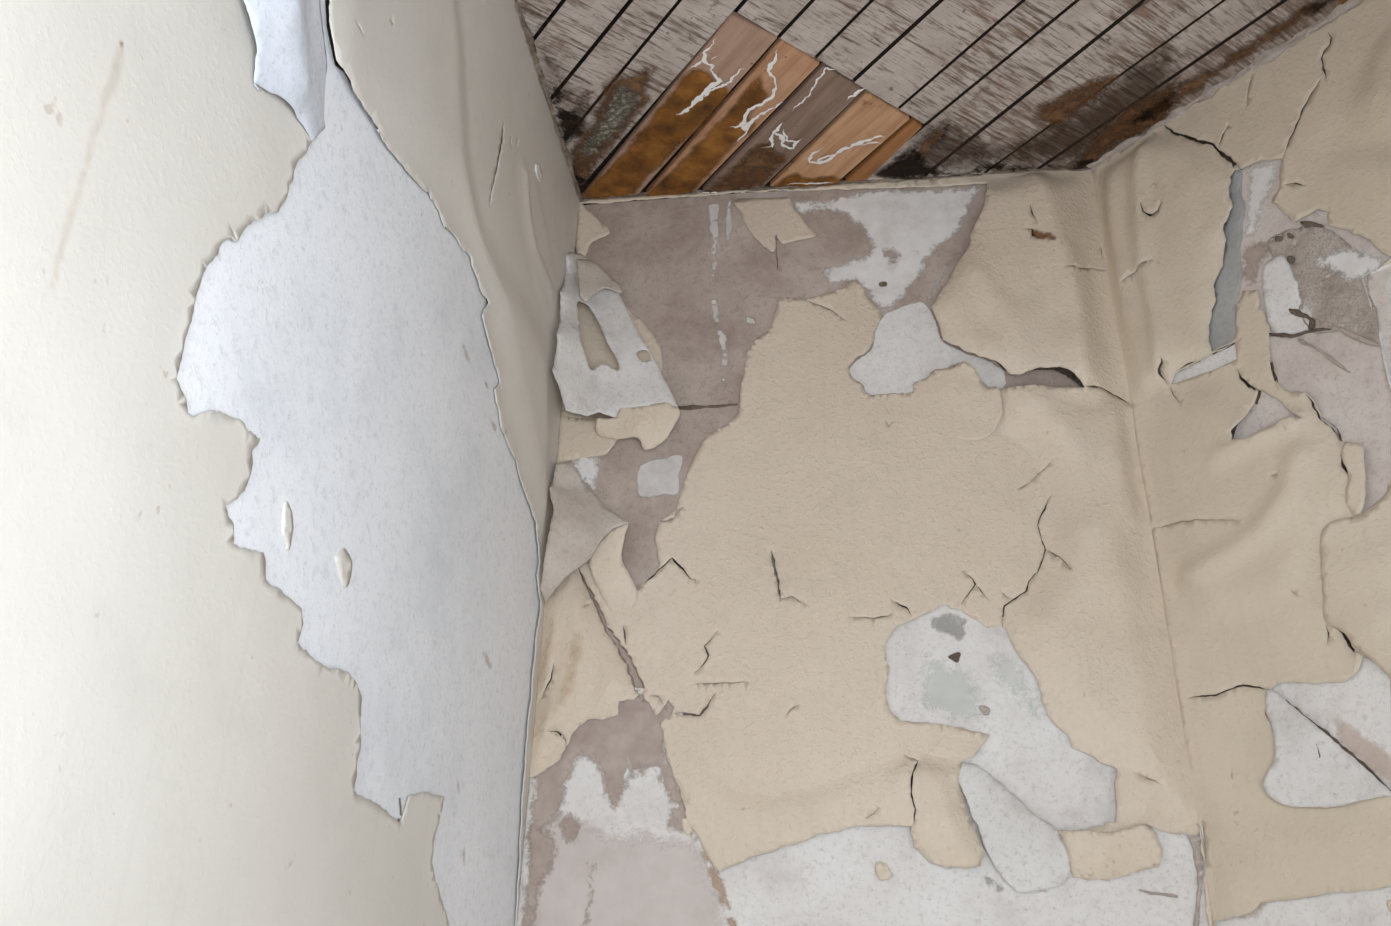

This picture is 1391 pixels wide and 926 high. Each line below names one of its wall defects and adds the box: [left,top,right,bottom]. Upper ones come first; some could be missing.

damp [546,39,885,199]
damp [876,0,1332,180]
crack [1285,34,1332,186]
peeling [1172,159,1391,514]
peeling [177,0,1209,926]
crack [578,568,737,716]
crack [644,558,696,584]
crack [771,551,803,603]
crack [962,465,1071,625]
peeling [1216,887,1391,926]